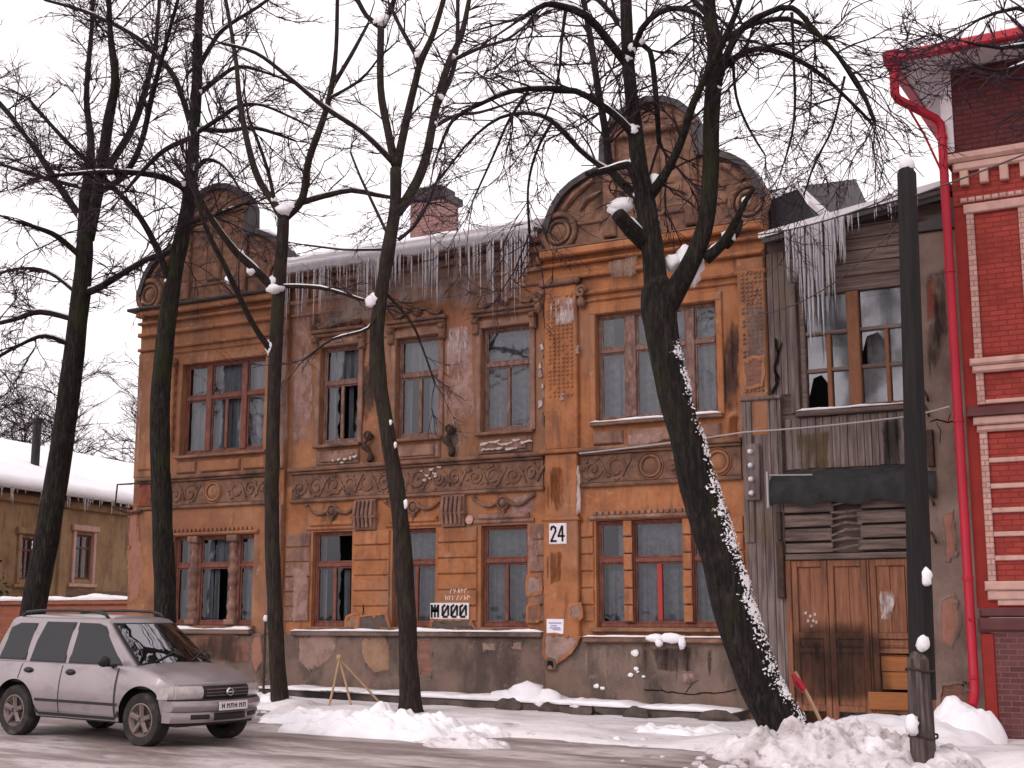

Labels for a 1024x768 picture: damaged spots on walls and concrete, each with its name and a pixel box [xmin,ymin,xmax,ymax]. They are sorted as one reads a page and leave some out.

leakage [927,272,947,365]
leakage [724,308,765,409]
peeling [297,636,338,673]
peeling [344,613,391,675]
peeling [937,591,962,650]